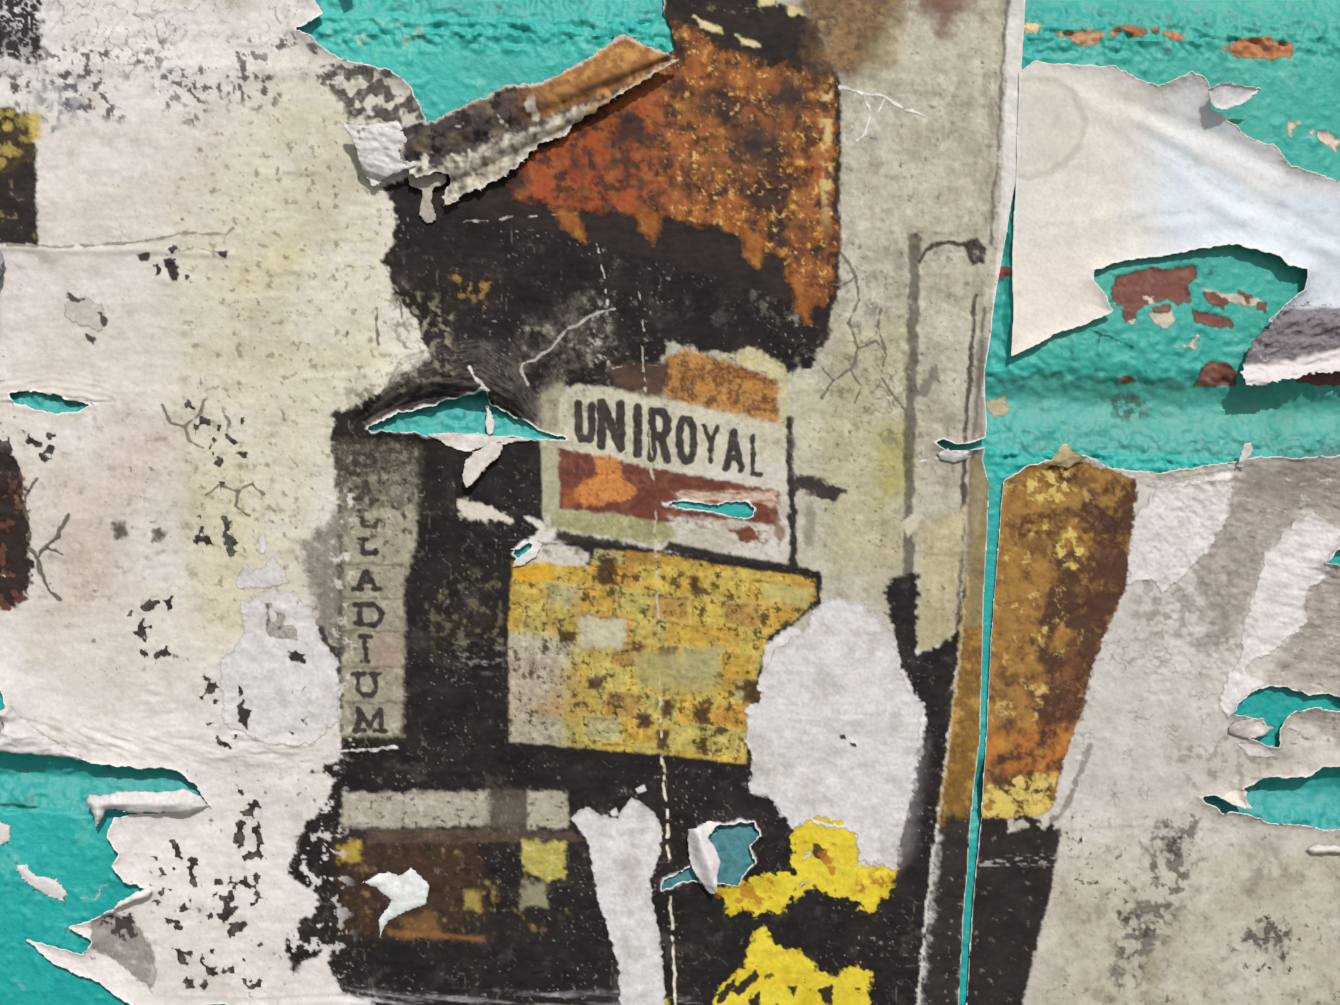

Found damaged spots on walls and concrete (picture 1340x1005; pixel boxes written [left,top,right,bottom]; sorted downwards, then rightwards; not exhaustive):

peeling [1024,21,1186,47]
peeling [1221,35,1293,60]
peeling [1288,121,1340,152]
peeling [1111,266,1267,349]
peeling [1194,361,1237,386]
peeling [1295,371,1340,386]
peeling [126,596,174,659]
peeling [1219,513,1340,718]
peeling [1238,743,1277,758]